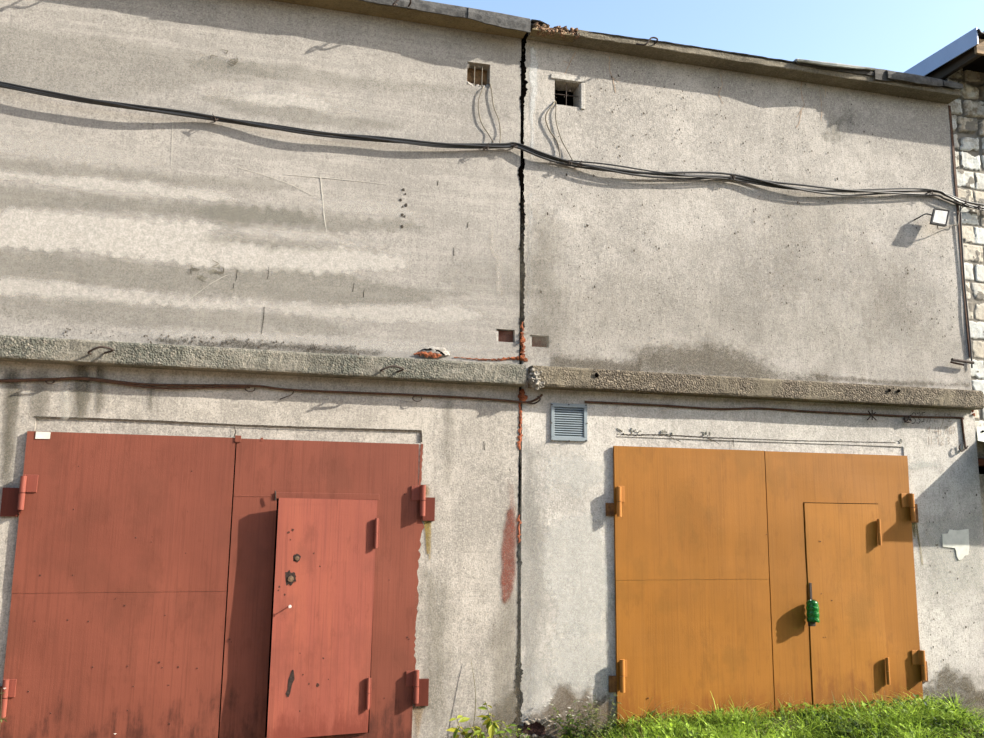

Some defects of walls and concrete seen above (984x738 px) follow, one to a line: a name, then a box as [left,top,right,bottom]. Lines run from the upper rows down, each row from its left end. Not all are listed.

spalling [533,22,580,40]
crack [518,39,528,328]
leakage [552,344,777,379]
leakage [64,365,103,416]
crack [514,456,524,738]